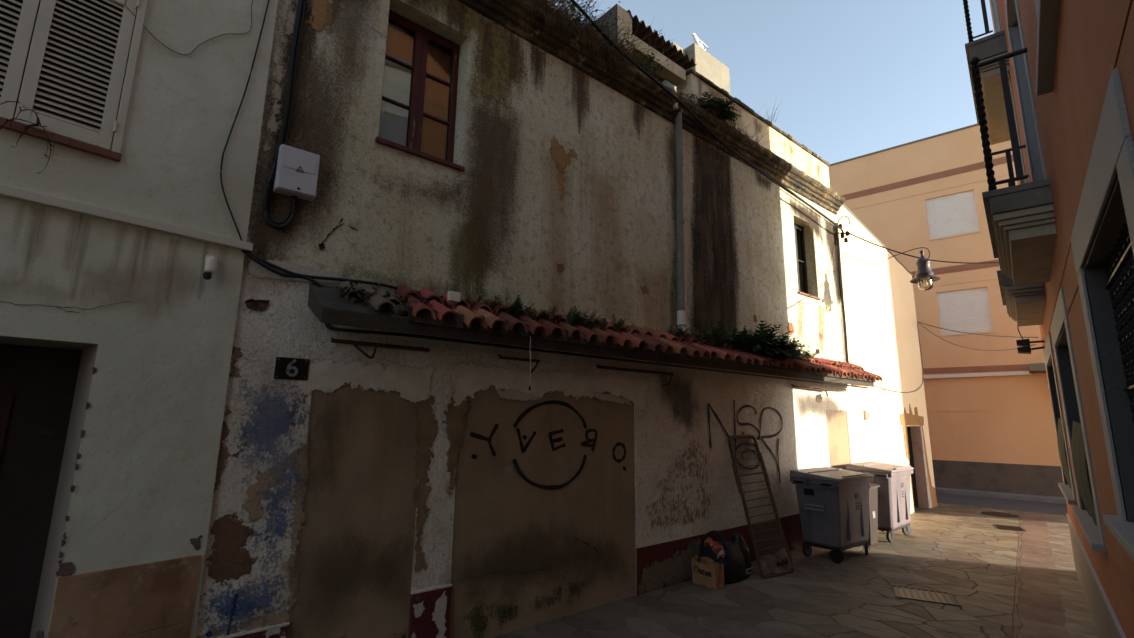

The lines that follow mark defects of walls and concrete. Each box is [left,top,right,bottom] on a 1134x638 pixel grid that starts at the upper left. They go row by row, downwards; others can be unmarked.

flaking render [279,0,336,52]
leakage [508,36,546,85]
flaking render [262,63,287,156]
leakage [251,0,379,260]
leakage [393,100,520,283]
flaking render [549,137,578,200]
leakage [689,135,739,337]
peeling [190,347,648,638]
flaking render [56,515,75,577]